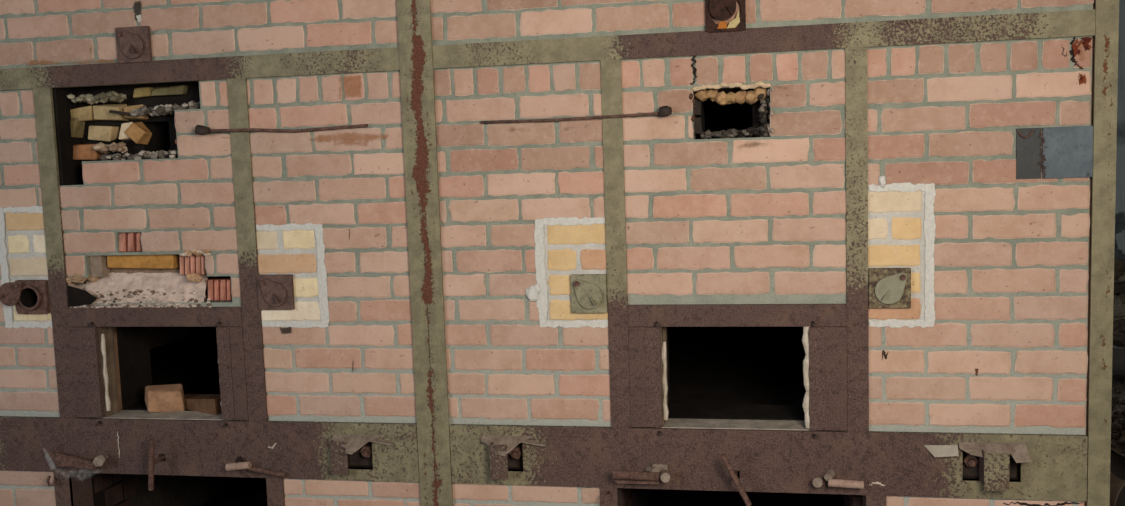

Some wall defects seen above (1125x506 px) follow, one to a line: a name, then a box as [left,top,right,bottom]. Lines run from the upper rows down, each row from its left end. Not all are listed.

corrosion [1072,35,1113,145]
corrosion [405,0,443,506]
peeling [1114,212,1125,261]
crack [1003,498,1083,506]